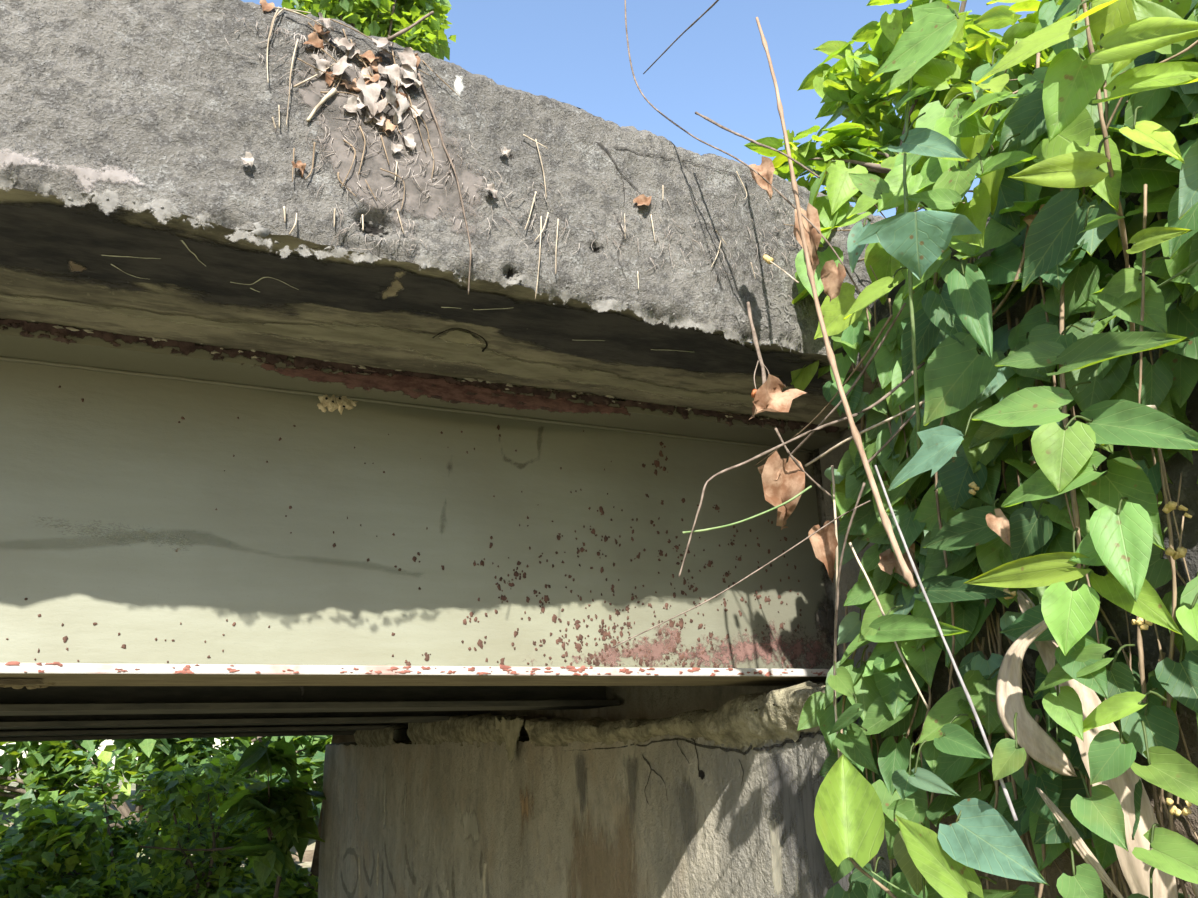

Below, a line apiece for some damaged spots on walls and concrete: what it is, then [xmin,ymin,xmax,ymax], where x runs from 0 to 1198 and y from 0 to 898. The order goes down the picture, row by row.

spalling [0,170,213,228]
spalling [226,221,404,299]
leakage [0,203,829,424]
rust [0,319,839,434]
rust [806,448,826,517]
rust [340,493,839,677]
rust [5,623,79,673]
rust [167,619,236,674]
crack [564,730,823,804]